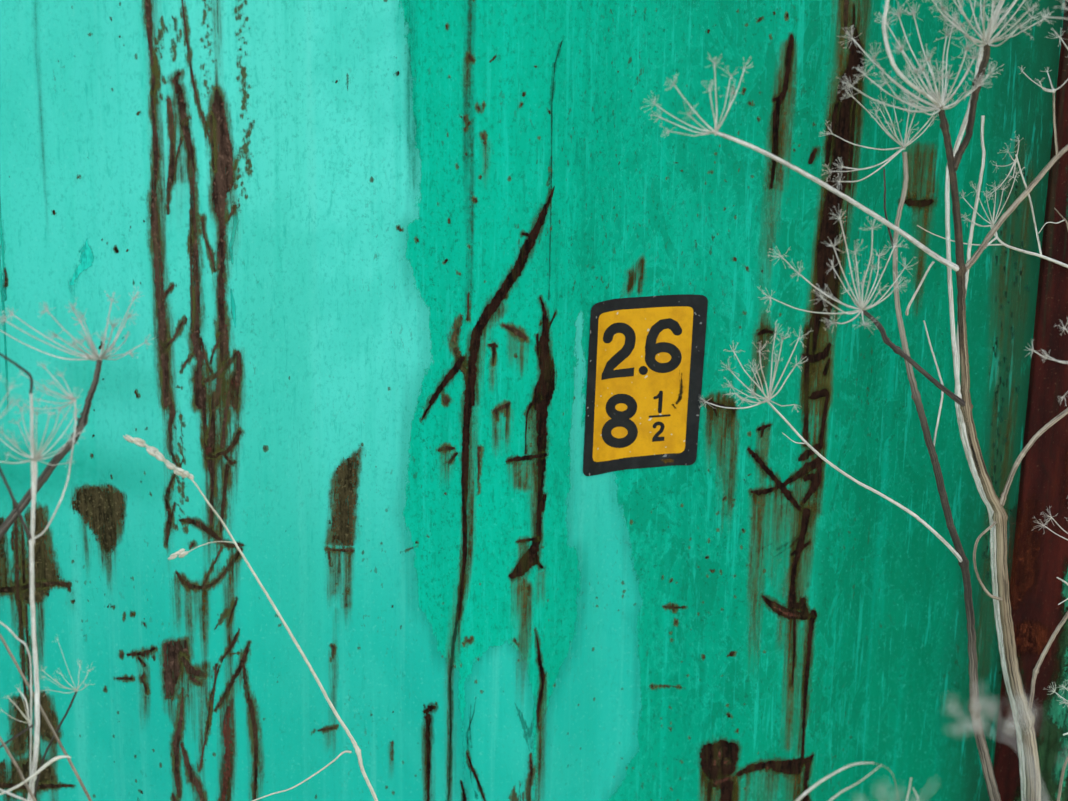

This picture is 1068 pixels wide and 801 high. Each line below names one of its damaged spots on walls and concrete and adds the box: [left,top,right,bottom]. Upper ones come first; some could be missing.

rust [151,16,182,104]
rust [232,0,255,211]
rust [701,0,870,611]
rust [491,400,511,446]
rust [0,691,74,801]
rust [0,503,75,661]
rust [72,475,127,573]
rust [104,640,164,711]
rust [159,414,244,801]
rust [324,443,364,608]
rust [415,578,486,801]
rust [1014,618,1052,683]